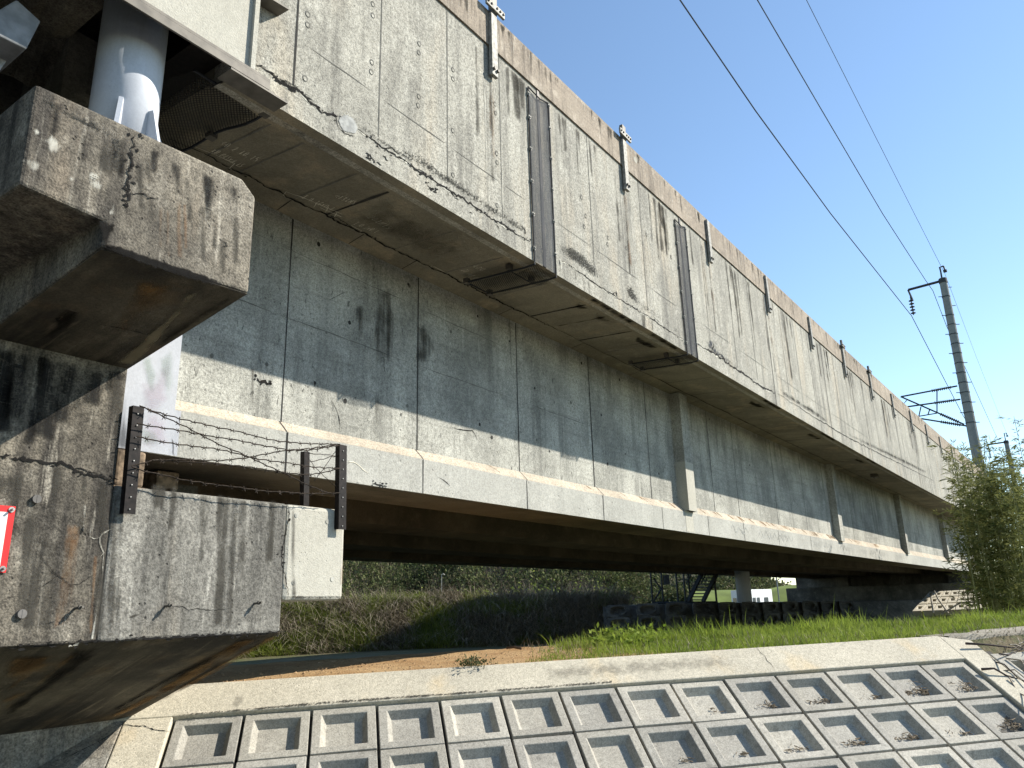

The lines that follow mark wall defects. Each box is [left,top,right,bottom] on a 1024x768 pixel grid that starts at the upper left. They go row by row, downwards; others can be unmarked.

damp [507,69,524,118]
damp [138,151,158,207]
crack [256,65,531,242]
damp [647,194,669,252]
damp [377,294,391,354]
crack [173,140,932,507]
damp [0,299,227,448]
crack [0,454,119,484]
damp [23,516,47,627]
damp [92,571,119,639]